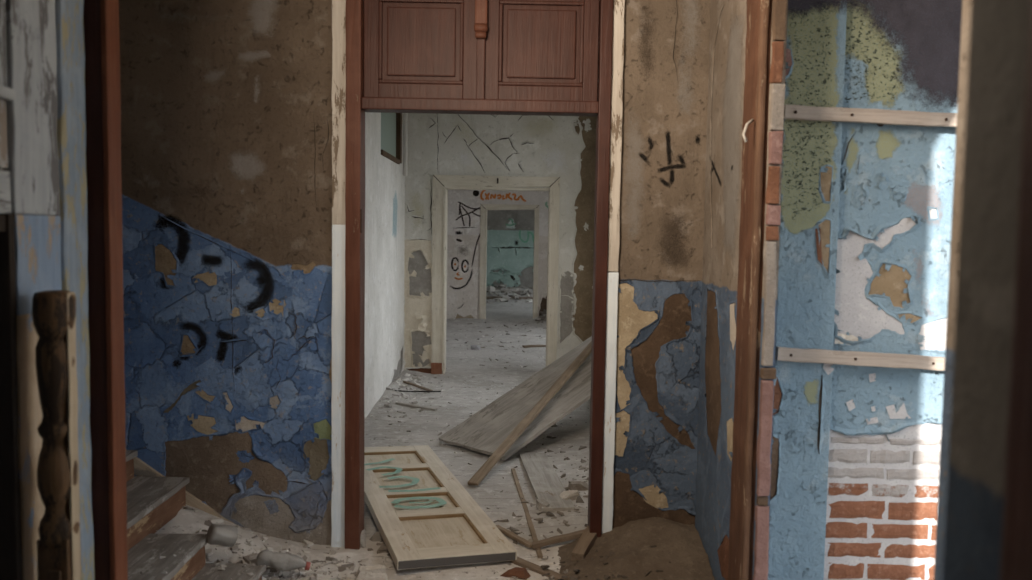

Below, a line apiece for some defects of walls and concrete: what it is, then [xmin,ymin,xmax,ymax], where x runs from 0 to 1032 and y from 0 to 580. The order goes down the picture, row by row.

peeling [784,0,905,110]
peeling [152,241,219,288]
peeling [228,296,285,321]
crack [407,114,534,240]
peeling [487,116,597,346]
peeling [781,119,947,355]
peeling [162,378,332,545]
peeling [612,281,737,528]
peeling [773,375,786,418]
flaking render [824,398,942,580]